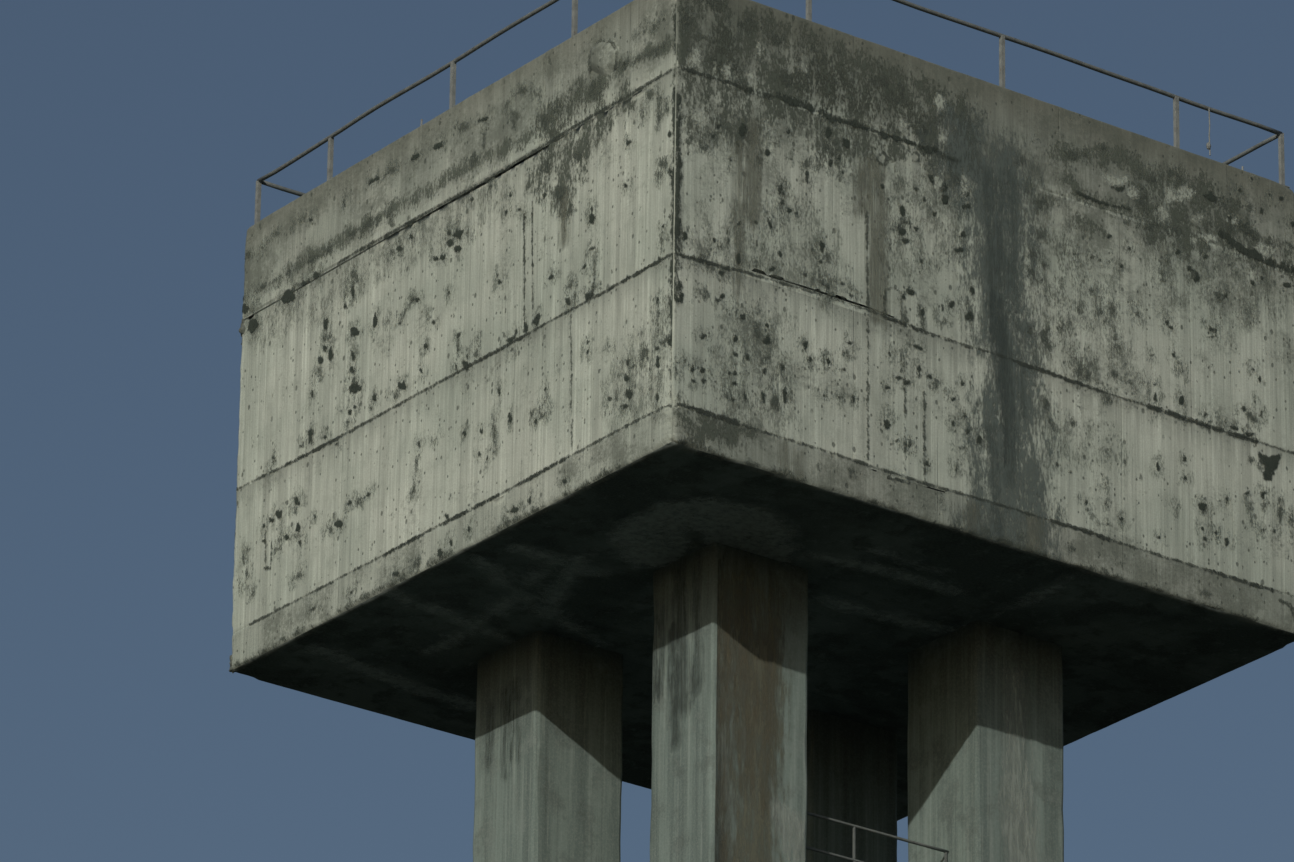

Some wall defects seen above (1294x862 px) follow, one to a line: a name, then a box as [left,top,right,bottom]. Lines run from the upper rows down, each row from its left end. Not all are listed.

damp [242,0,1294,561]
spalling [1067,346,1294,550]